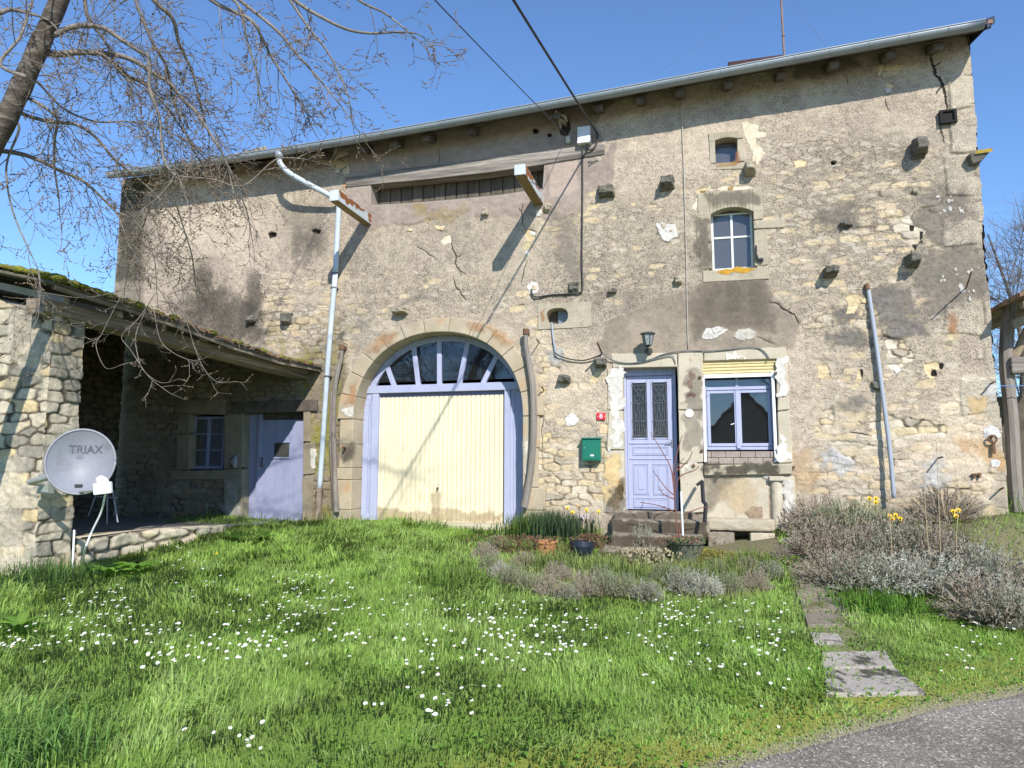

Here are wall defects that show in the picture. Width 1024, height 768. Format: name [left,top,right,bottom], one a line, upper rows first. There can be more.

crack [930,55,948,144]
crack [417,242,465,299]
water stain [695,280,766,337]
water stain [872,188,989,339]